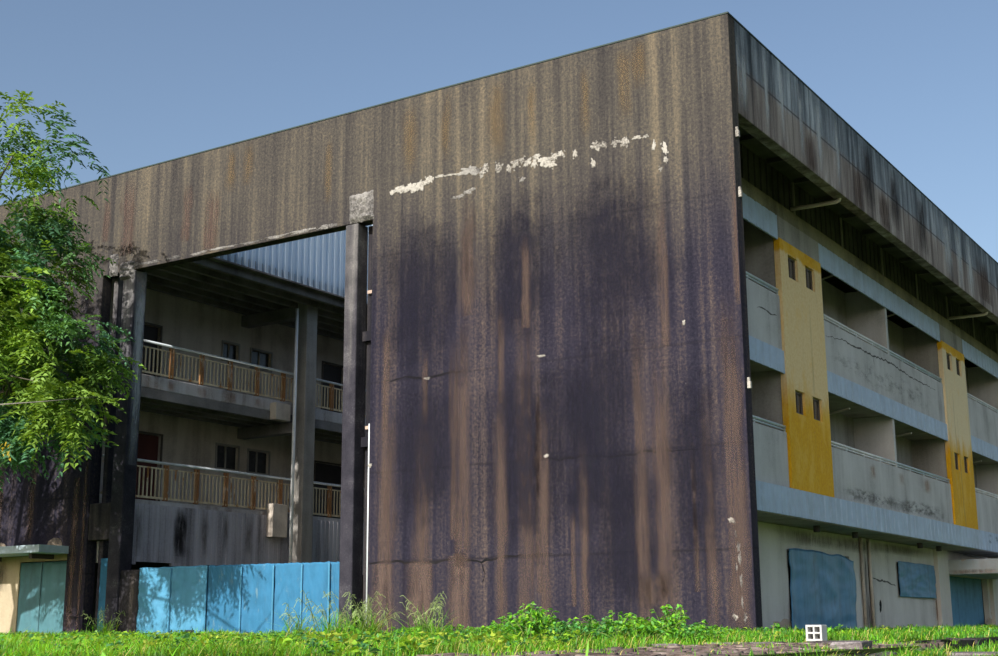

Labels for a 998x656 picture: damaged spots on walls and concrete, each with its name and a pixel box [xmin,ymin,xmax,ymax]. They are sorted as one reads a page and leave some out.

flaking render [390,149,577,200]
flaking render [590,134,669,172]
leakage [497,212,542,324]
crack [827,336,935,390]
leakage [175,519,186,554]
rust [497,448,506,623]
leakage [493,377,561,527]
rust [634,376,673,622]